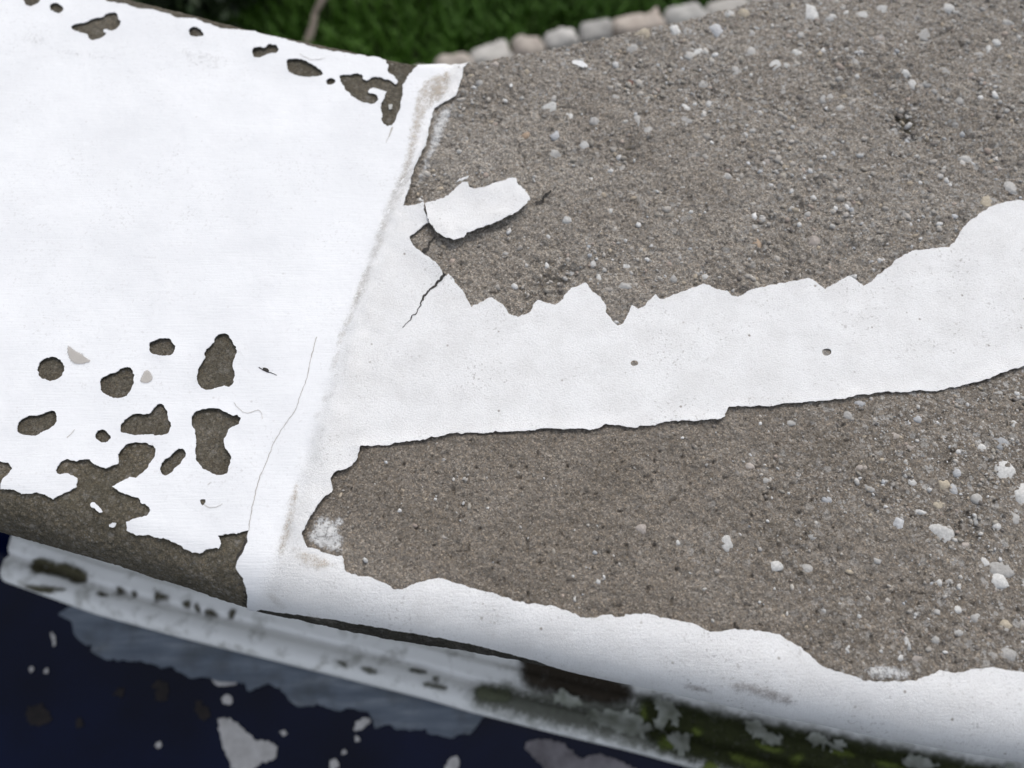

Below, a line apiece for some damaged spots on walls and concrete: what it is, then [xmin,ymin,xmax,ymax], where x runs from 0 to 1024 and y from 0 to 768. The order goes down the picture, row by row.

peeling [72,0,417,126]
spalling [404,0,1024,325]
crack [535,190,551,205]
crack [422,237,435,253]
crack [402,273,446,328]
peeling [38,357,64,381]
peeling [100,367,134,398]
peeling [149,338,175,356]
peeling [197,334,237,390]
peeling [0,404,561,670]
spalling [302,366,1024,682]
peeling [212,679,287,768]